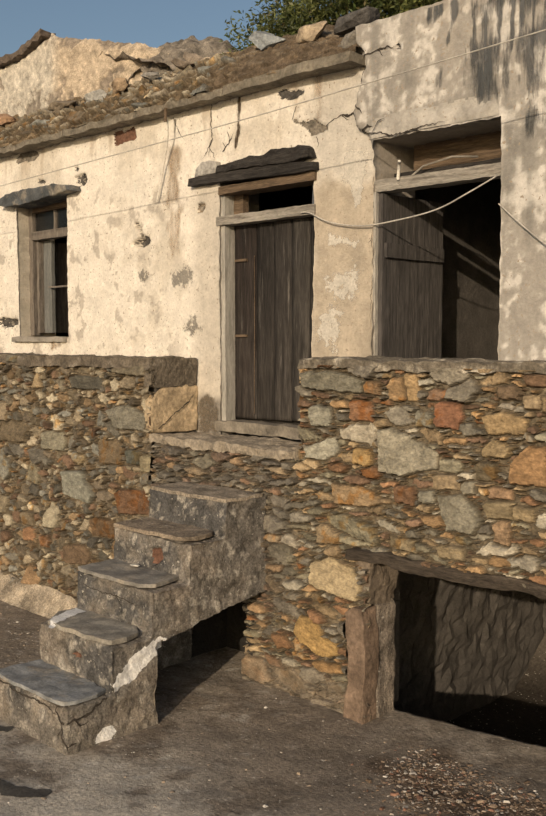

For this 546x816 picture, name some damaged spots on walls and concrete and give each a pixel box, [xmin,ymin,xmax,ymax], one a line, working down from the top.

water stain [427,0,459,45]
water stain [470,0,546,101]
spalling [278,89,304,100]
crack [316,45,445,147]
spalling [16,151,39,164]
spalling [114,127,137,146]
crack [203,104,232,158]
water stain [526,111,537,134]